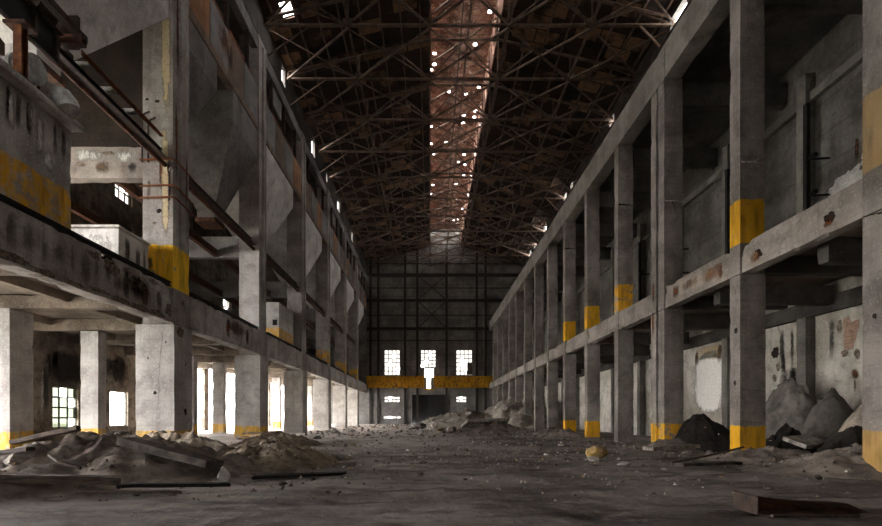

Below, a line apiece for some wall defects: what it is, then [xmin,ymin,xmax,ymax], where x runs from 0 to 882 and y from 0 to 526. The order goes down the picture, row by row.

peeling [828,139,862,197]
corrosion [673,265,722,297]
damp [780,332,794,370]
spalling [837,316,860,359]
peeling [695,350,722,412]